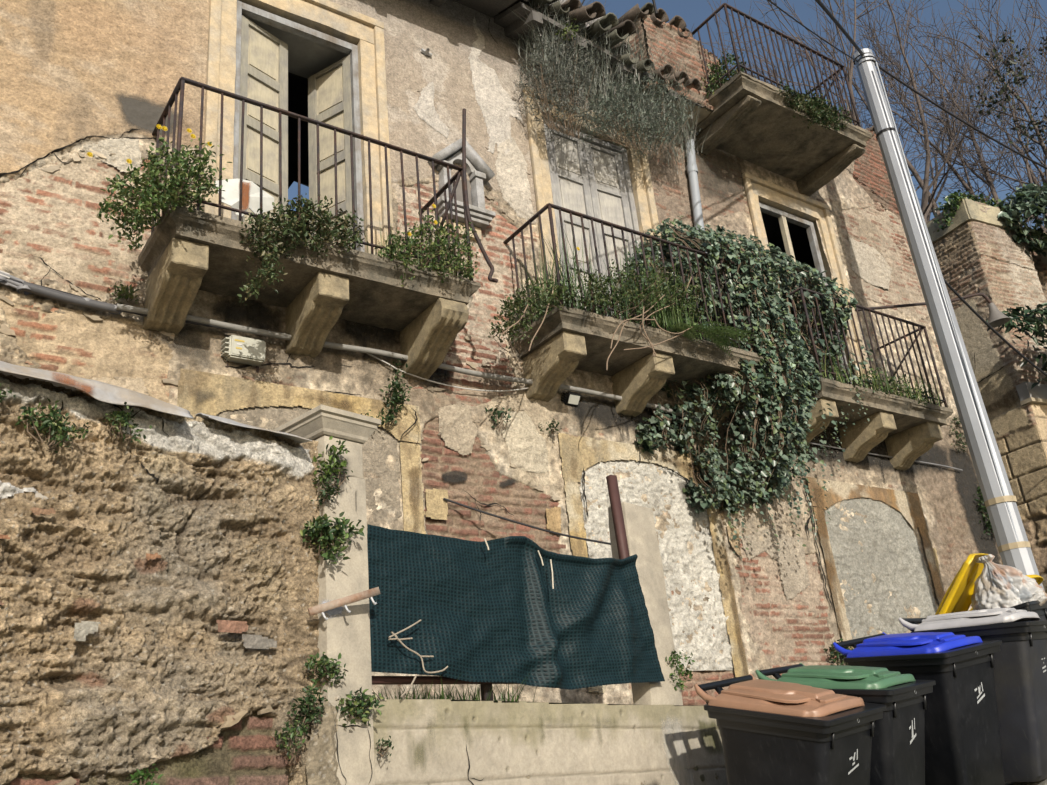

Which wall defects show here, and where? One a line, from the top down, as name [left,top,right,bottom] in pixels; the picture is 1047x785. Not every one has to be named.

crack [0,129,160,177]
spalling [0,138,178,403]
spalling [391,17,566,554]
rust [53,373,92,392]
spalling [733,528,840,680]
spalling [10,706,290,785]
spalling [306,696,341,785]
crack [466,746,484,785]